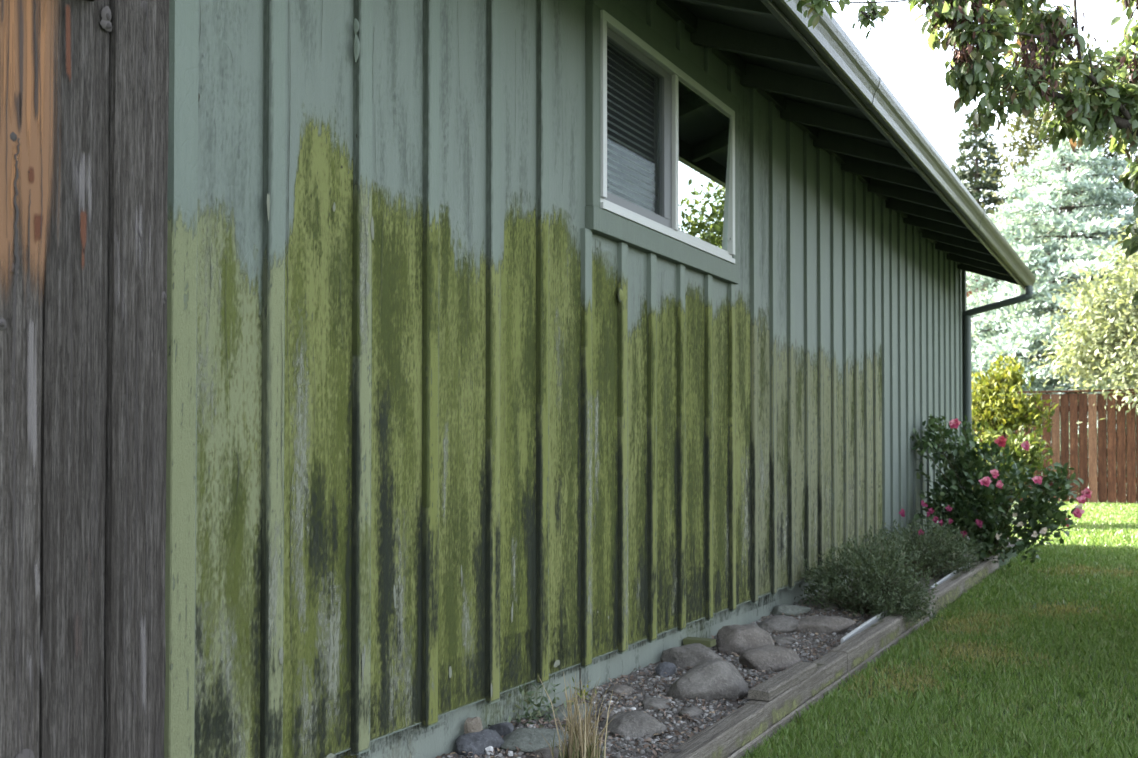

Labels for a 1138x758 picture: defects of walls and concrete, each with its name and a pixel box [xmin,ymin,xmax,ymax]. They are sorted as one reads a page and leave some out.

leakage [194,675,237,758]
leakage [252,355,822,758]